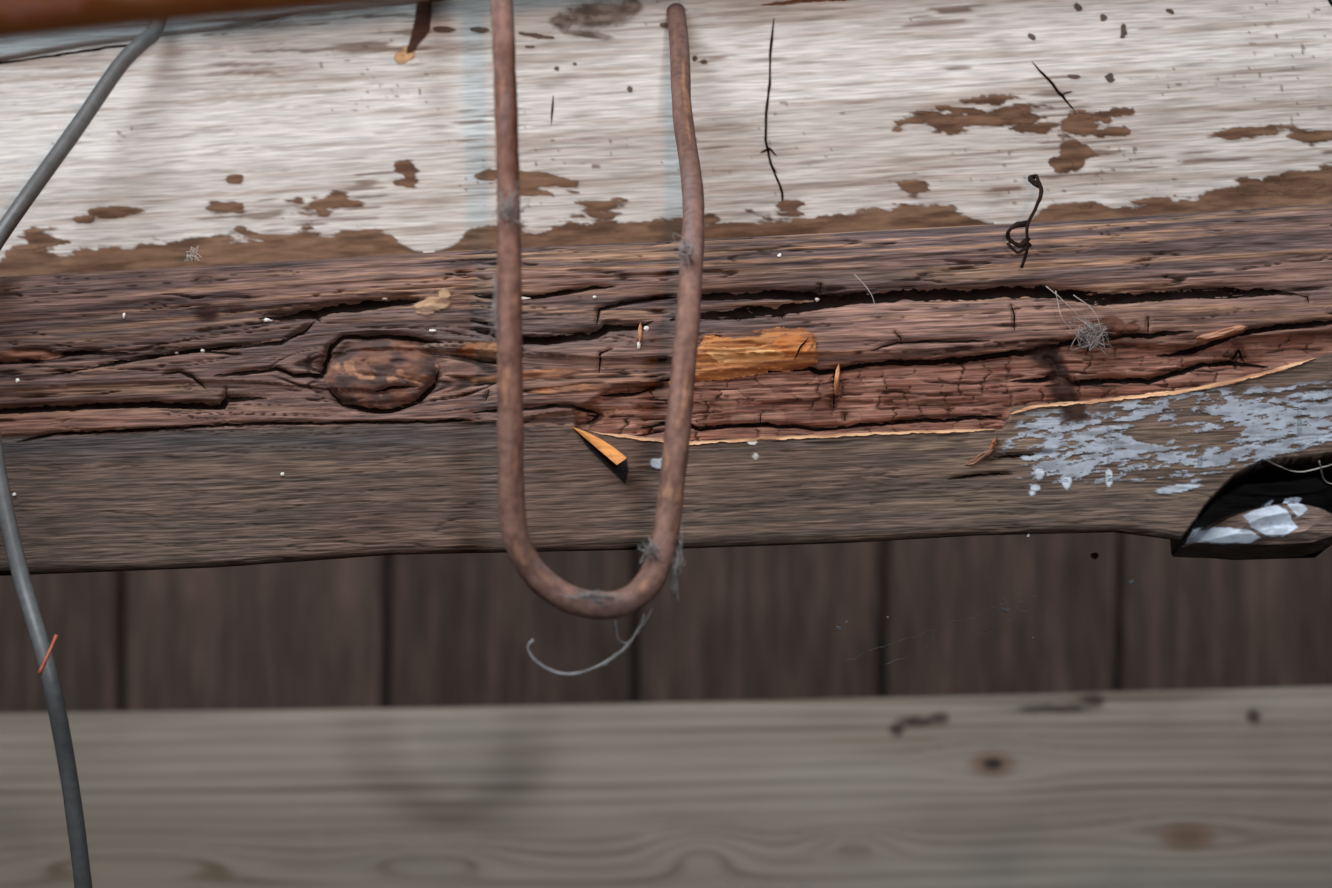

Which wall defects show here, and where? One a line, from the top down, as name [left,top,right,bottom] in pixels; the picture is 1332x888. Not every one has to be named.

crack [0,283,1332,442]
peeling [706,333,812,363]
water stain [1028,344,1086,421]
crack [947,454,1035,479]